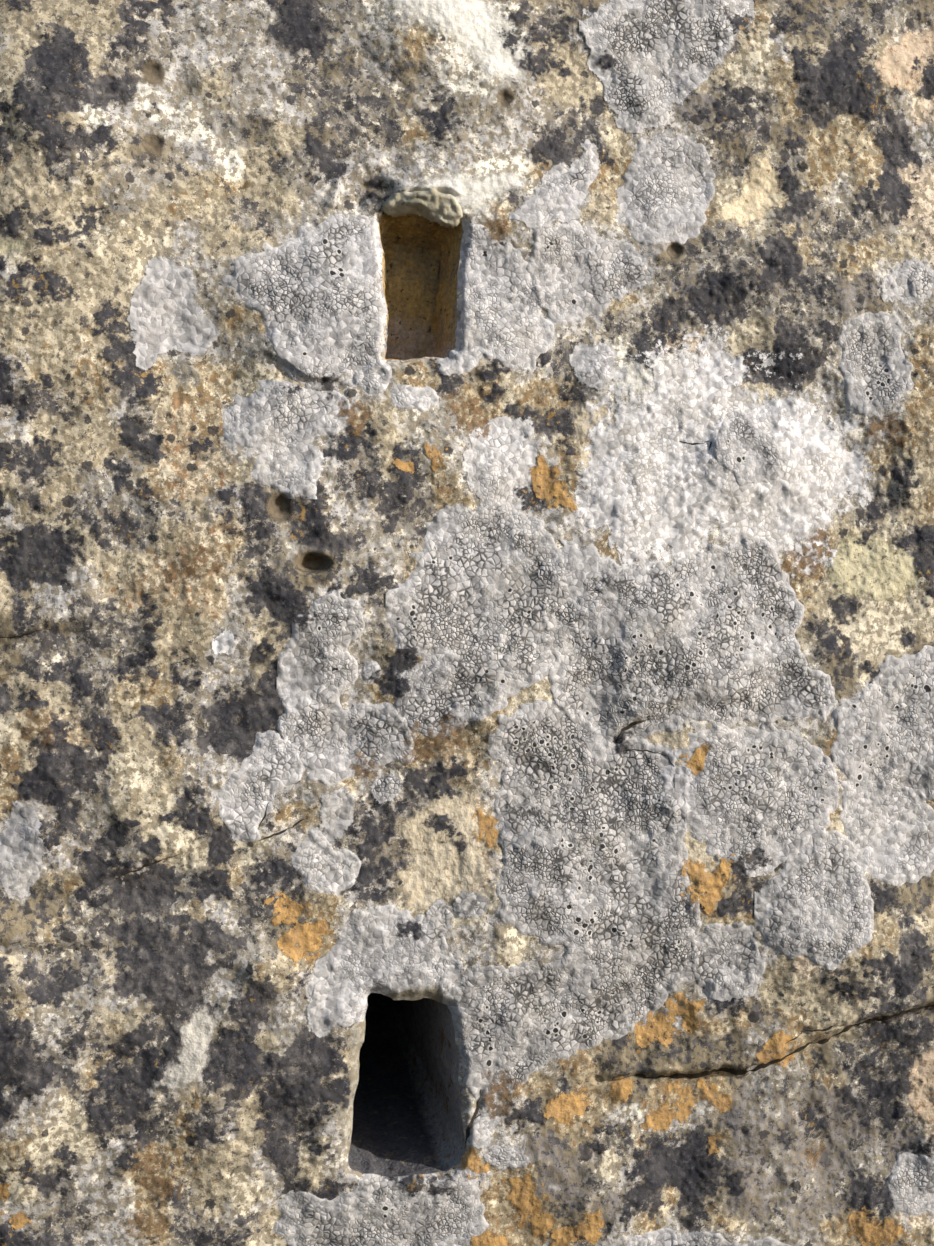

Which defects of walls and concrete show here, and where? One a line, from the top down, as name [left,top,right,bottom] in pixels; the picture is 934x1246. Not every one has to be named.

crack [596,1004,934,1082]